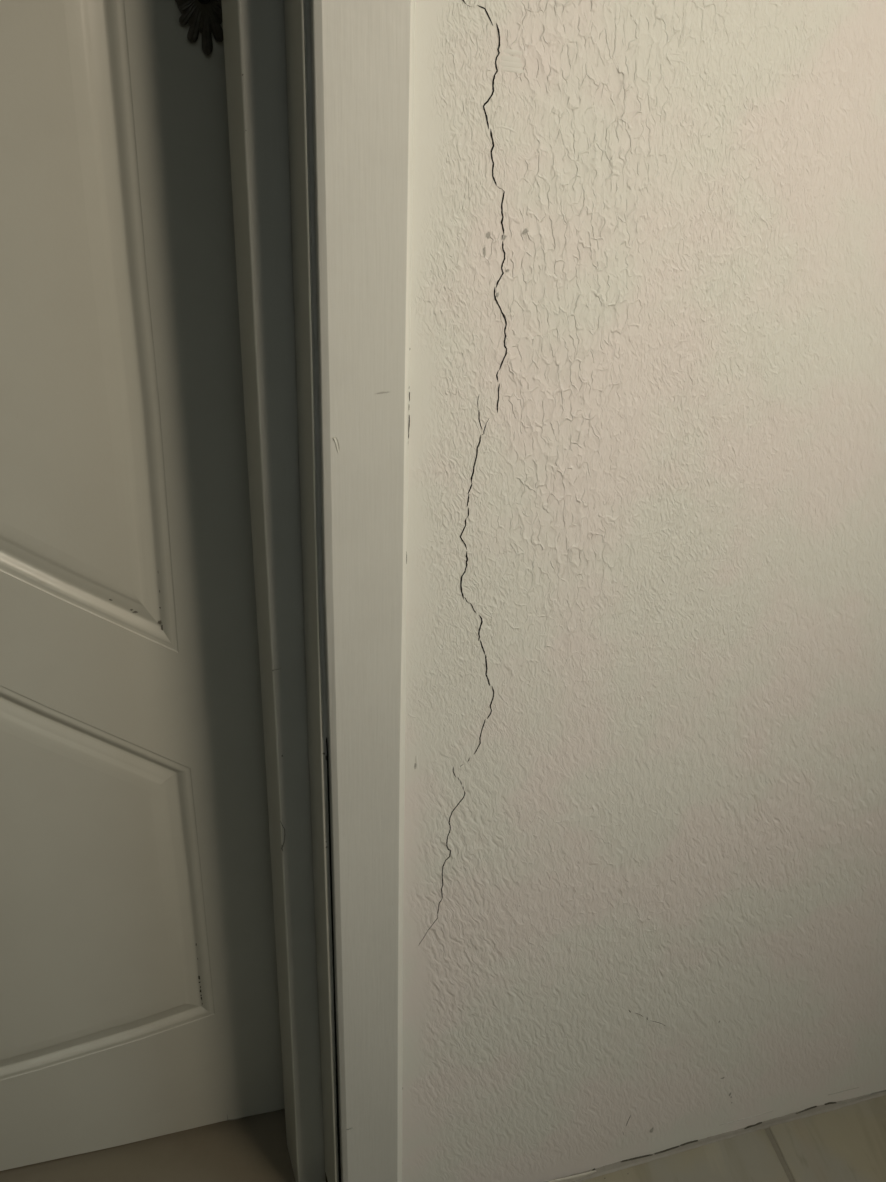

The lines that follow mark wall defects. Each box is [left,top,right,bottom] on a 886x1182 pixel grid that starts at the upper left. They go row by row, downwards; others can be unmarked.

crack [418,0,507,946]